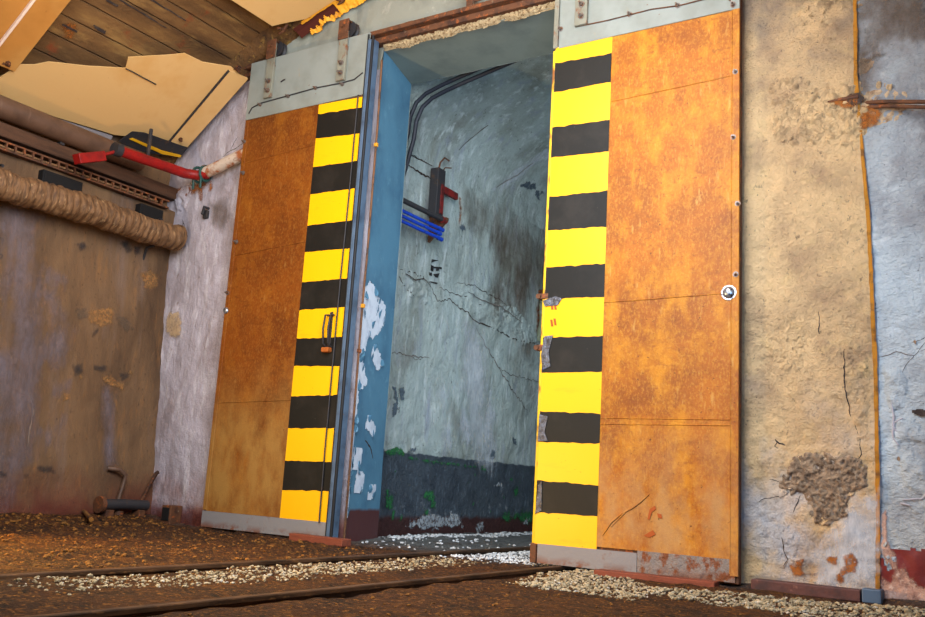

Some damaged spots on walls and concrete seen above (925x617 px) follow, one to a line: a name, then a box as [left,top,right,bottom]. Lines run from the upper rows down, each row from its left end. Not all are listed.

spalling [293,4,339,38]
rust [834,93,880,129]
rust [206,104,319,518]
peeling [347,281,403,520]
crack [400,269,539,410]
rust [597,10,732,559]
spalling [759,339,878,526]
crack [853,0,925,589]
leakage [405,510,463,530]
rust [790,559,804,575]
rust [827,554,858,582]